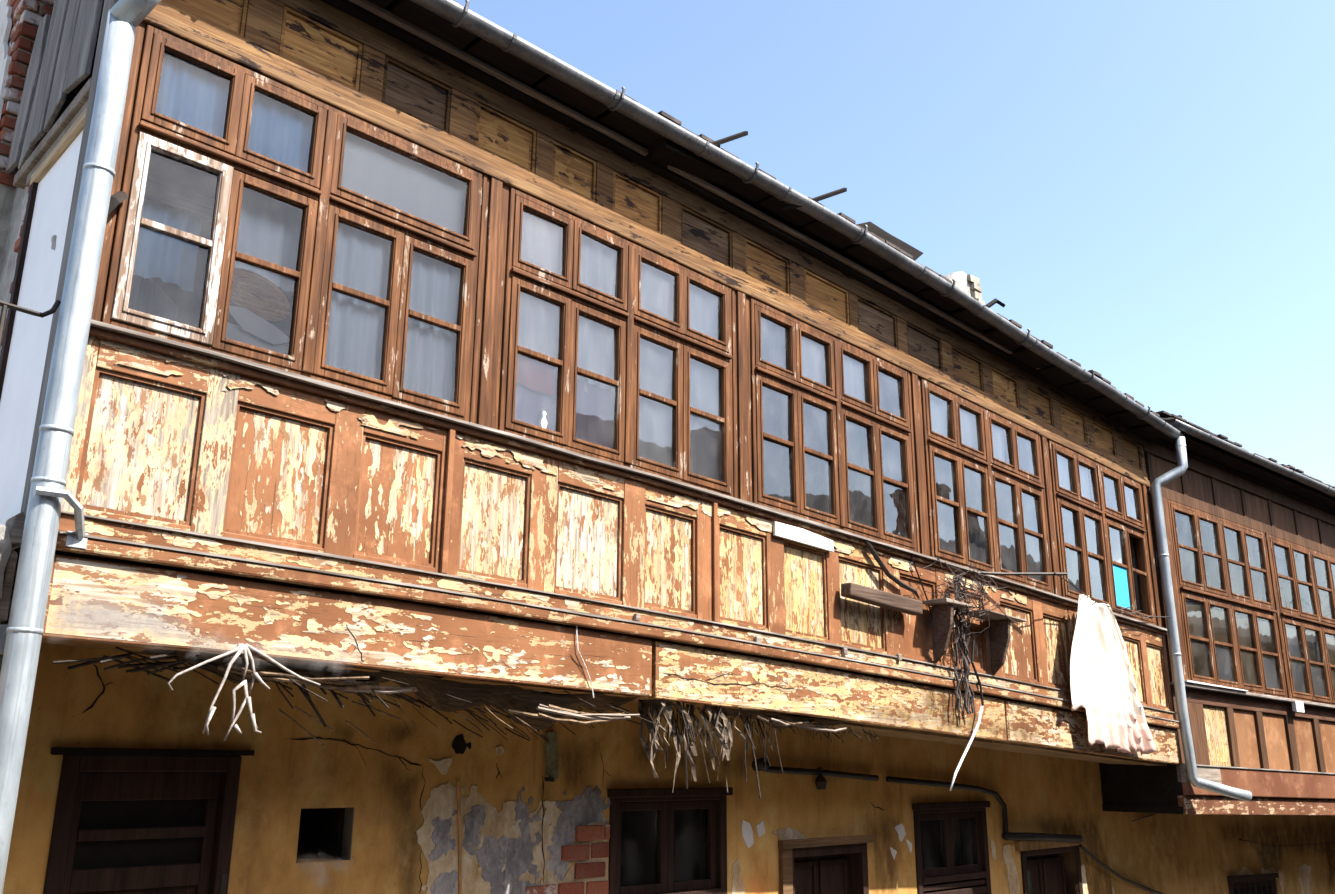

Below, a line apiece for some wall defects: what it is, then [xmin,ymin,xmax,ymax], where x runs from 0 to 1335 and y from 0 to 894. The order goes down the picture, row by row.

peeling [81,355,224,548]
peeling [217,372,280,395]
peeling [236,410,338,569]
peeling [297,393,618,615]
peeling [45,541,1178,763]
peeling [640,495,826,649]
flaking render [416,734,611,894]